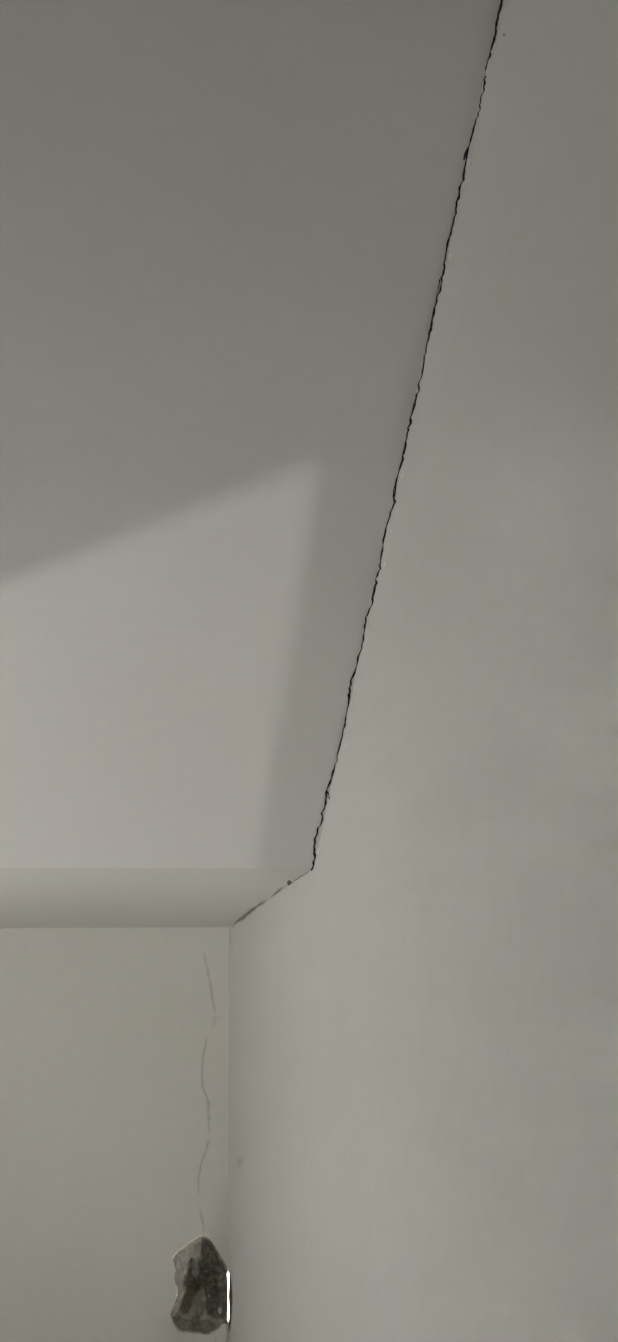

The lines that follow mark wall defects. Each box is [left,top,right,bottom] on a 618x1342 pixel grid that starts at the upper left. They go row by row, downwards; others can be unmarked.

crack [235,0,503,923]
spalling [170,1236,232,1335]